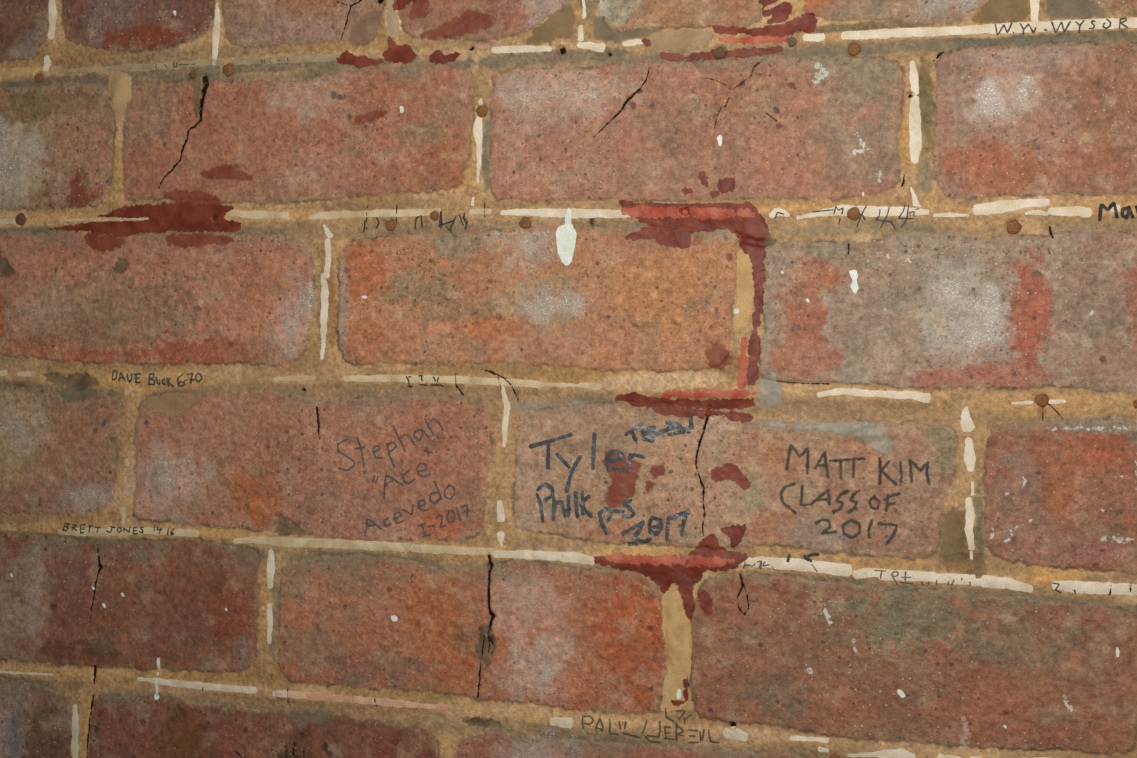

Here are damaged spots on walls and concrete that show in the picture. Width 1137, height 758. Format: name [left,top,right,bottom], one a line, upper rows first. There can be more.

crack [157,76,209,191]
crack [593,67,650,137]
crack [695,407,710,536]
crack [90,544,103,620]
crack [477,554,495,698]
crack [86,665,97,758]